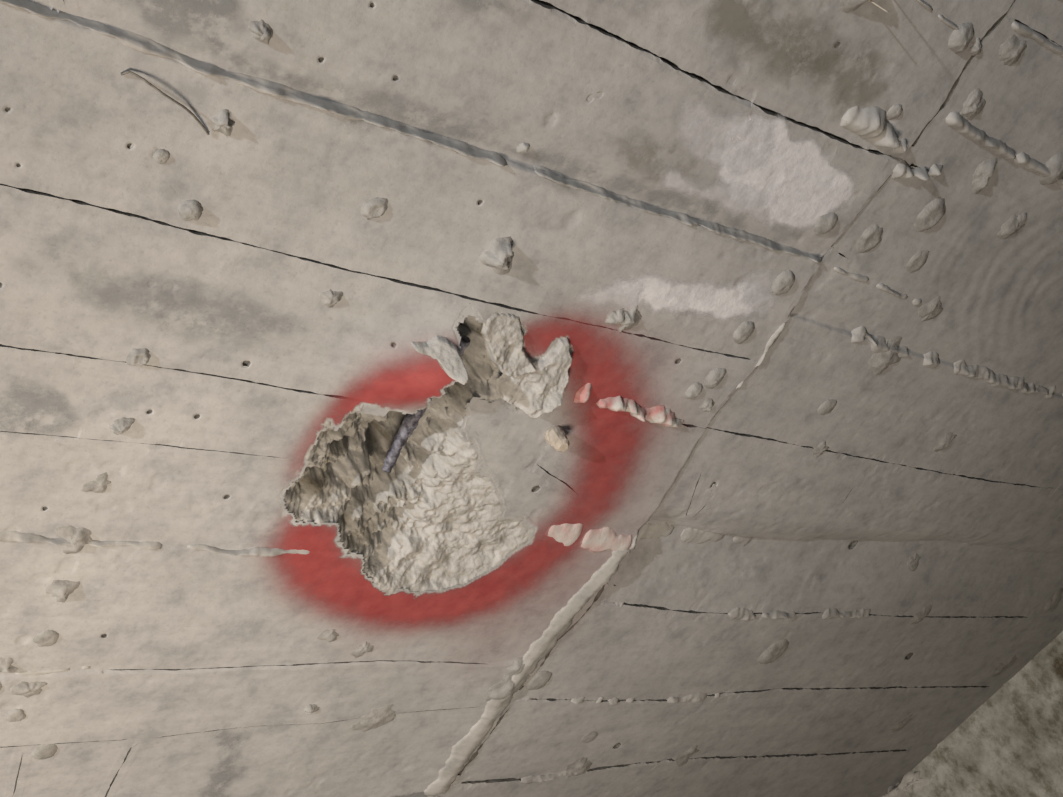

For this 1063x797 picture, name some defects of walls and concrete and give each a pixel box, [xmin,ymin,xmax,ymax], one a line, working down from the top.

crack [0,0,1063,502]
damp [665,107,854,228]
spalling [272,301,574,599]